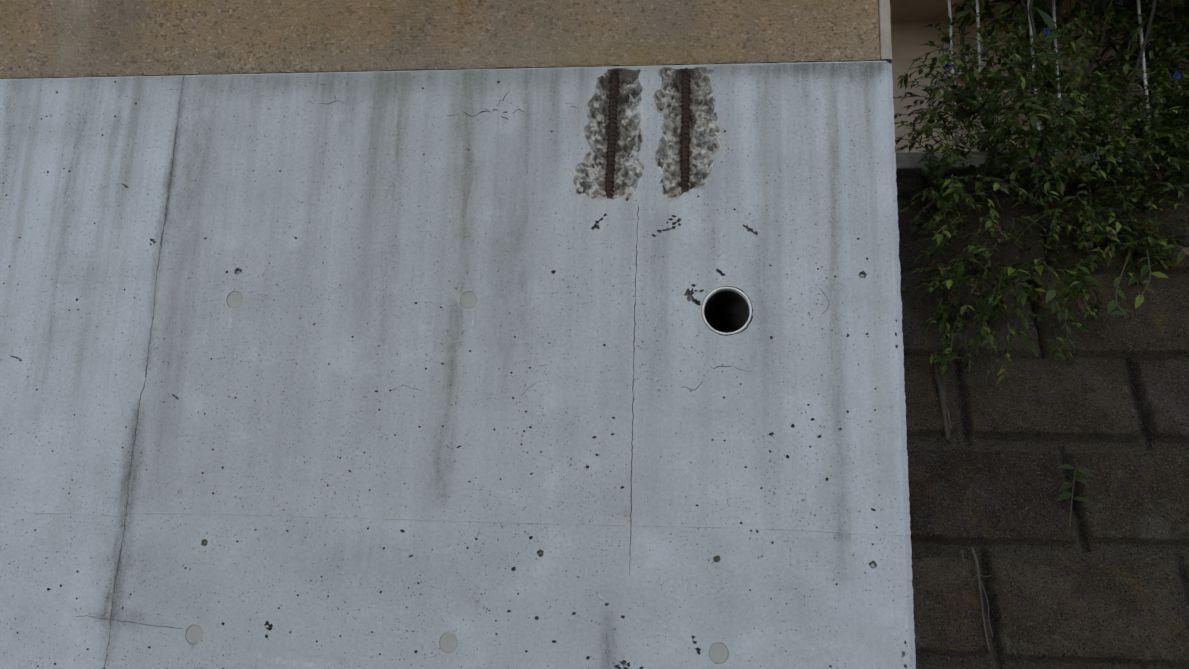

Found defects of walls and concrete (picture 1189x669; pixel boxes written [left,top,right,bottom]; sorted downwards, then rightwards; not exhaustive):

spalling [572,66,726,201]
spalling [651,215,681,237]
crack [76,75,185,669]